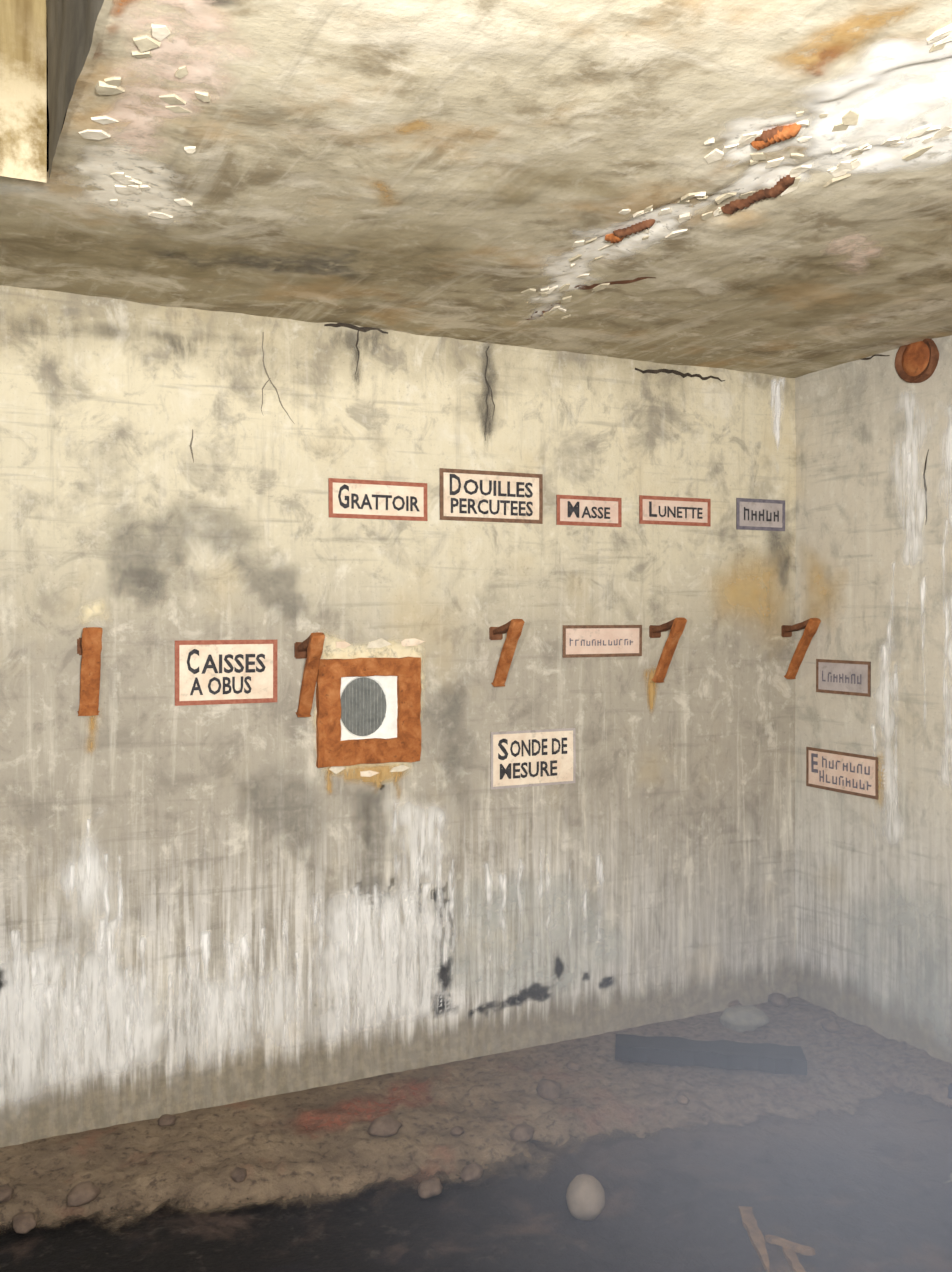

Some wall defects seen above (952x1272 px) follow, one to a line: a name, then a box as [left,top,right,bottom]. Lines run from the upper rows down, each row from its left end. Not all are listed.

spalling [926,24,952,52]
spalling [521,110,952,319]
crack [635,368,725,382]
leakage [893,394,925,572]
leakage [942,408,952,566]
leakage [872,596,903,842]
rust [327,766,402,792]
leakage [486,864,523,928]
leakage [0,806,468,1103]
leakage [469,983,549,1015]
leakage [555,959,563,977]
leakage [583,973,613,987]